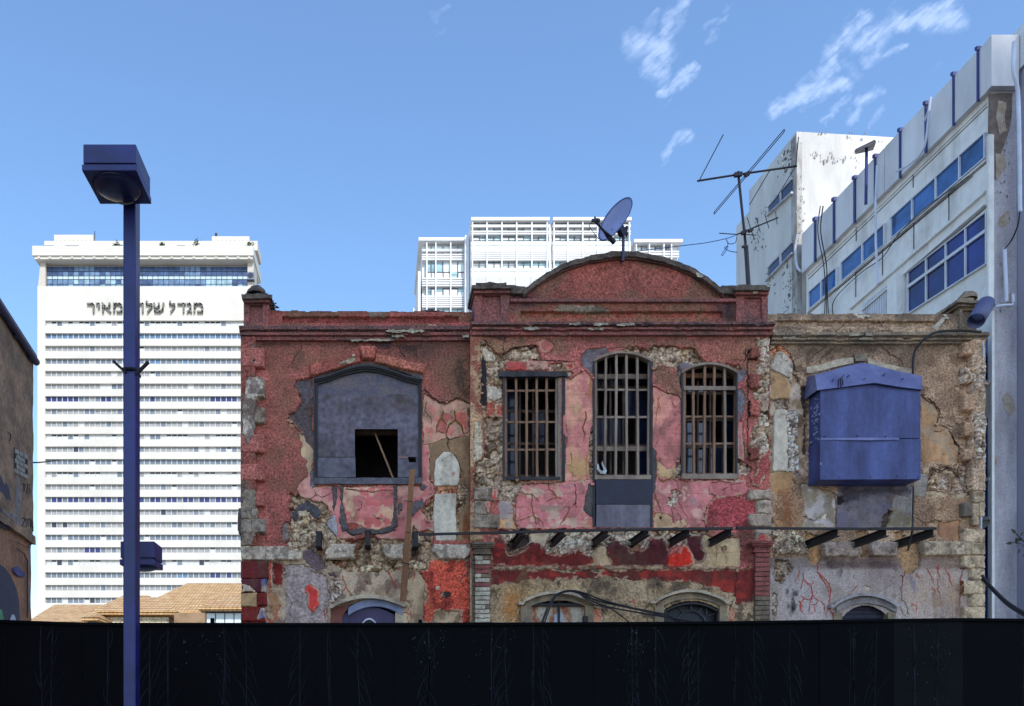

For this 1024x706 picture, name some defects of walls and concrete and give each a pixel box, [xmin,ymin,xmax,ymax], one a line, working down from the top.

crack [493,336,592,527]
peeling [241,326,844,623]
crack [921,394,964,490]
peeling [920,396,997,499]
peeling [881,491,926,574]
crack [794,565,857,618]
crack [900,565,964,617]